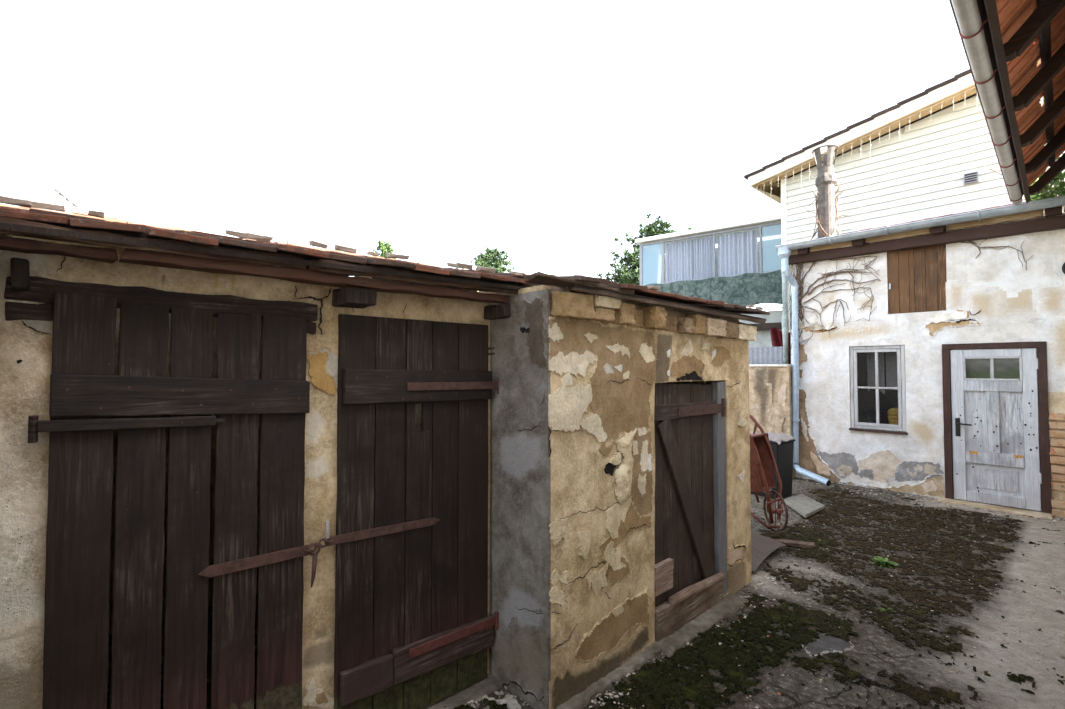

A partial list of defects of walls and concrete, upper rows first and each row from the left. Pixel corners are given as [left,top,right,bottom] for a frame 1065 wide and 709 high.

flaking render [923,310,983,339]
flaking render [306,346,338,395]
flaking render [777,279,958,498]
flaking render [520,295,731,596]
flaking render [726,540,747,567]
flaking render [549,569,569,607]
crack [568,562,611,599]
crack [514,606,579,650]
flaking render [575,590,651,662]
flaking render [302,677,334,709]
crack [824,653,936,709]